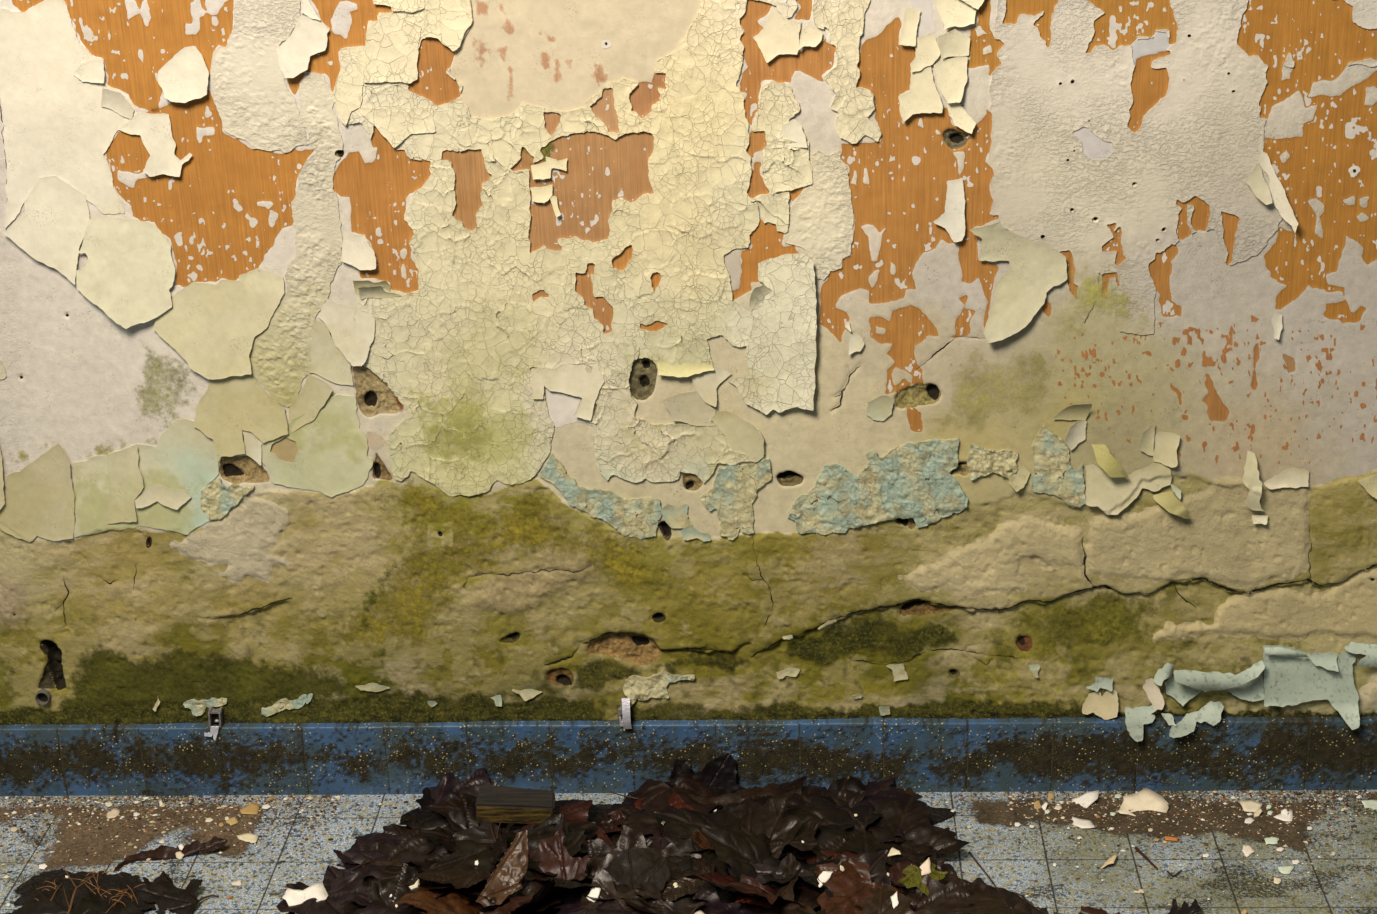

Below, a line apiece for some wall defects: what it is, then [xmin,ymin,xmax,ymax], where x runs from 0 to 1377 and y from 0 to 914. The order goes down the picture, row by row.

peeling [0,0,1078,548]
peeling [1054,0,1377,525]
crack [545,529,1377,665]